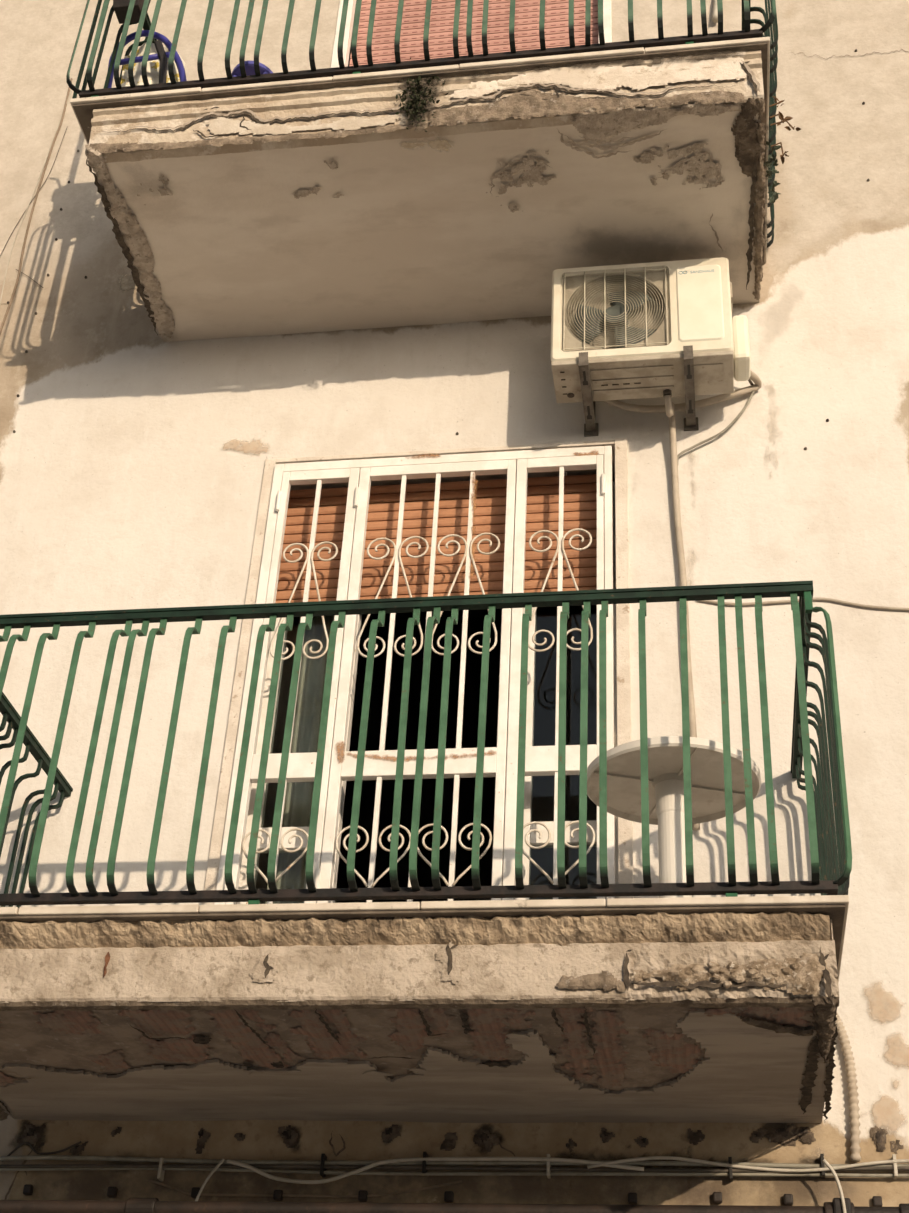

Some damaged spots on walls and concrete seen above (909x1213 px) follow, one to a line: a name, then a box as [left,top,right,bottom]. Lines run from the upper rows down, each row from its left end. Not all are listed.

crack [87,60,760,138]
peeling [427,56,767,300]
spalling [85,116,414,342]
peeling [223,439,268,454]
spalling [249,948,279,983]
spalling [435,942,469,984]
spalling [556,953,837,1063]
peeling [865,982,909,1154]
flaking render [15,1120,46,1150]
flaking render [278,1125,301,1150]
leakage [555,1146,770,1169]
flaking render [749,1123,816,1146]